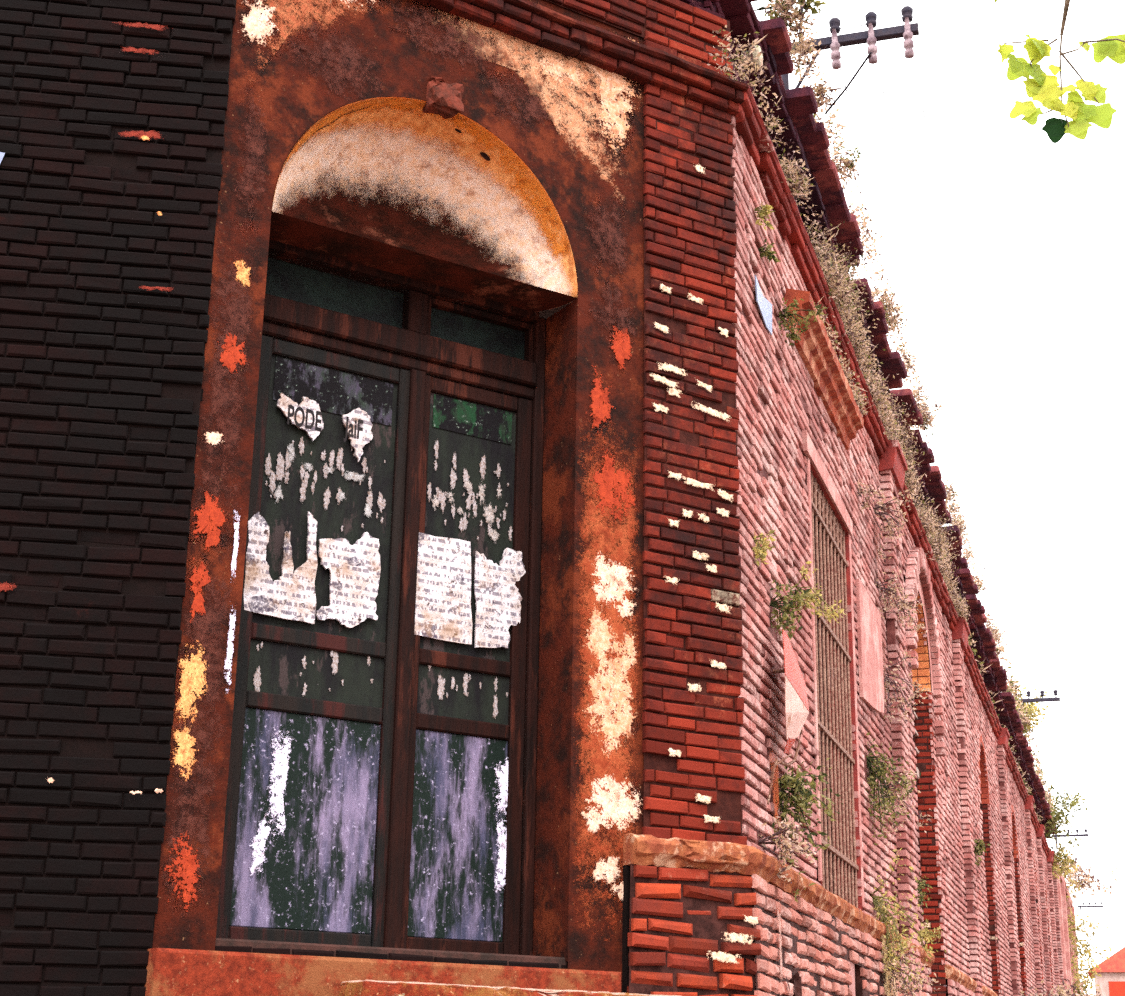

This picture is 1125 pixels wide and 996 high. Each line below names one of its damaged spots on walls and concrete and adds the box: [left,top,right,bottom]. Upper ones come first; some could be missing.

leakage [293,24,378,94]
leakage [393,4,553,124]
flaking render [233,260,251,287]
flaking render [217,333,246,373]
flaking render [610,326,632,369]
flaking render [190,491,240,623]
peeling [224,607,236,694]
flaking render [574,365,643,940]
flaking render [173,641,209,781]
flaking render [164,833,201,912]